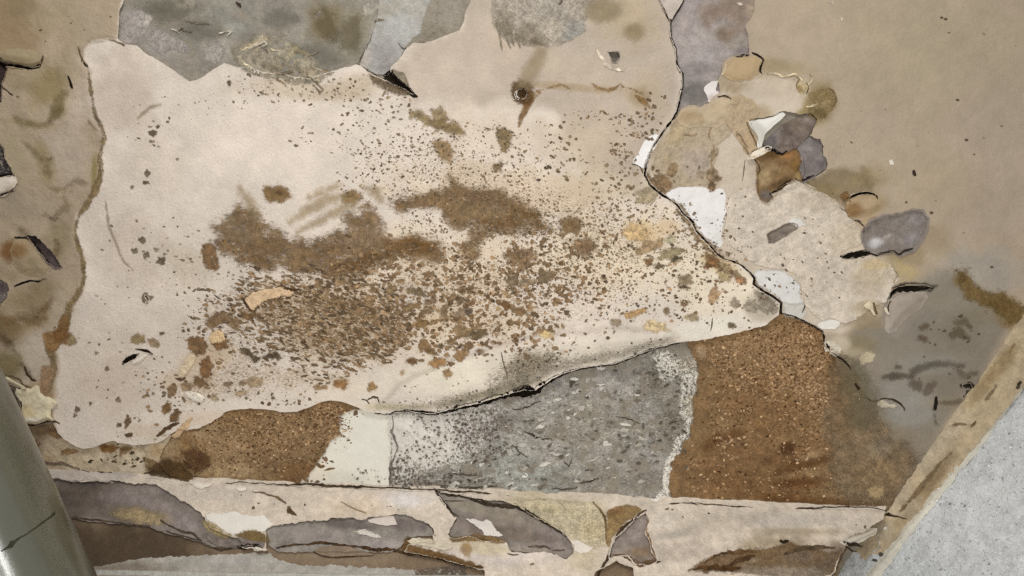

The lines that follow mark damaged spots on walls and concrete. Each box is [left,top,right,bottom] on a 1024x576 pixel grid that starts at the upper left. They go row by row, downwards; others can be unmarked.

peeling [118,0,471,98]
peeling [491,0,598,49]
leakage [31,71,131,393]
spalling [6,349,690,576]
leakage [100,68,843,502]
crack [362,318,713,415]
crack [632,0,905,410]
peeling [633,0,934,357]
spalling [688,528,949,576]
peeling [858,351,875,365]